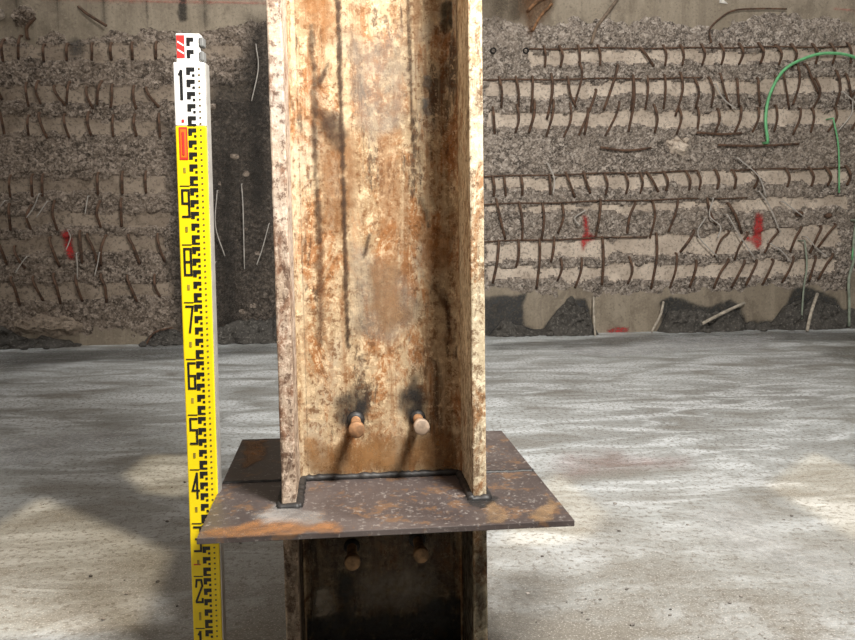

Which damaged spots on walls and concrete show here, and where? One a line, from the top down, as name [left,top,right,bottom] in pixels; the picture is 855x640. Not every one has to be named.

spalling [0,5,188,338]
spalling [200,19,276,329]
rust [309,0,354,347]
rust [408,0,429,142]
rust [440,1,452,32]
spalling [482,0,855,298]